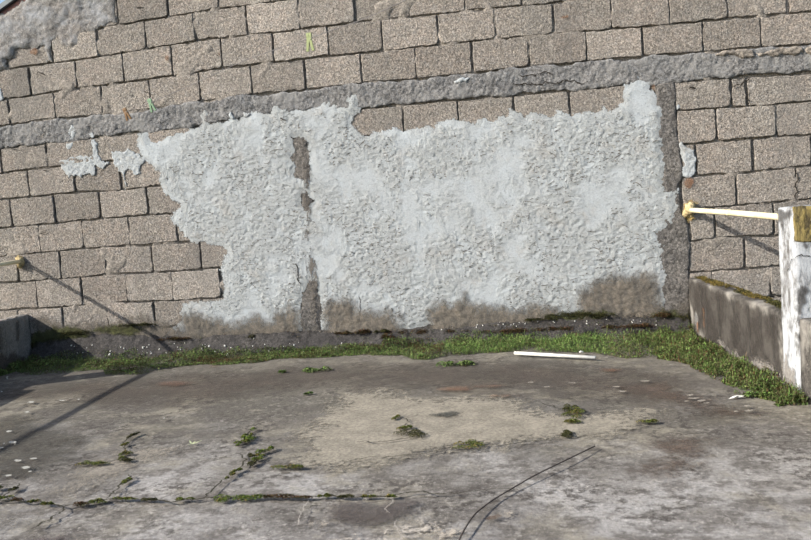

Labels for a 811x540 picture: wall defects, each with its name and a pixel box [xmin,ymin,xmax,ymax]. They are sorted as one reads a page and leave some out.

flaking render [290,137,322,333]
water stain [321,298,404,333]
water stain [428,293,558,330]
water stain [574,272,663,320]
water stain [678,281,781,378]
crack [0,430,518,540]